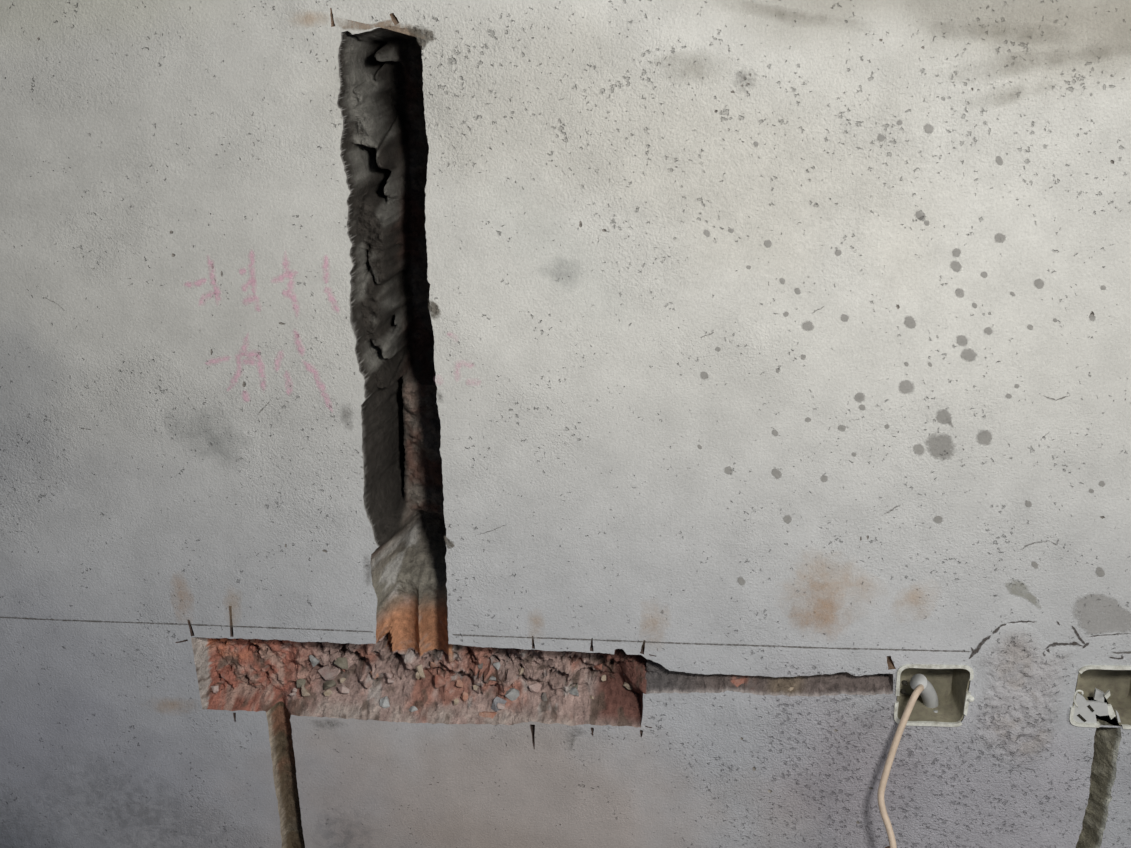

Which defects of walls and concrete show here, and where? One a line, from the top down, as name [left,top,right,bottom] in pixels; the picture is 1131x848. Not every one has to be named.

spalling [409,27,436,47]
spalling [429,302,440,318]
crack [0,617,367,632]
crack [453,621,1131,659]
spalling [286,655,350,697]
spalling [415,662,500,705]
spalling [491,668,547,712]